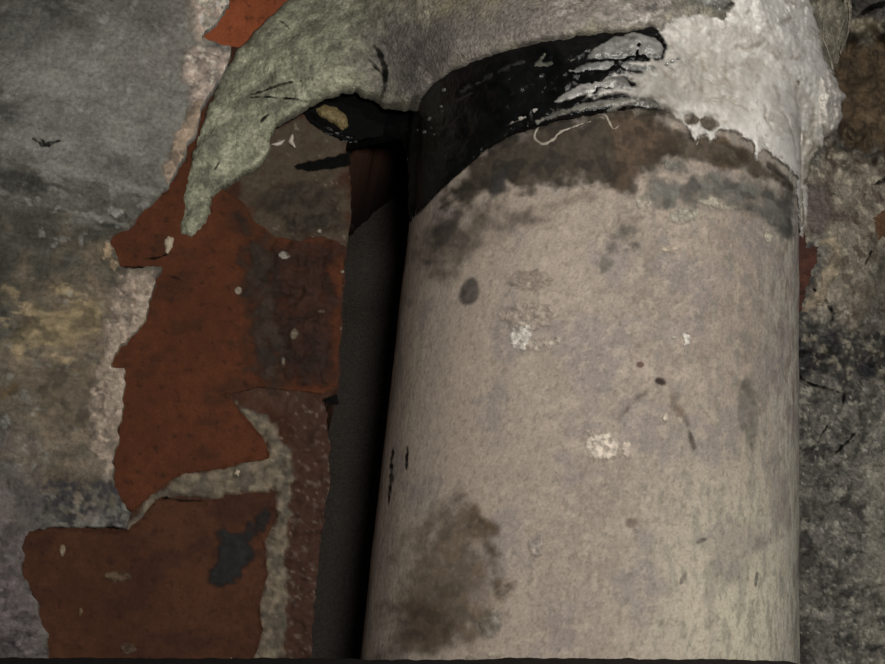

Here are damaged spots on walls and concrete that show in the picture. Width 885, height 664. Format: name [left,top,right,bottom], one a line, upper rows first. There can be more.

leakage [429,0,846,275]
spalling [0,0,344,659]
leakage [405,508,502,646]